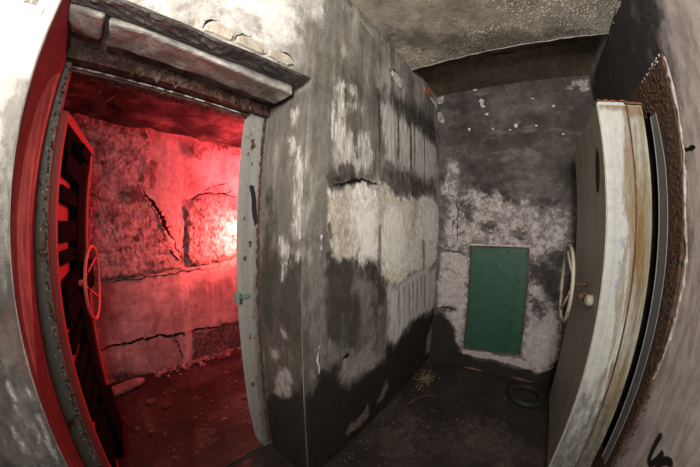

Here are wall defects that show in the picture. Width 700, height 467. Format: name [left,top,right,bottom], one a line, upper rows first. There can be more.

crack [104,183,235,285]
water stain [289,137,304,239]
crack [329,177,382,188]
water stain [327,82,436,201]
water stain [481,185,514,203]
corrosion [594,59,683,467]
crack [100,322,239,361]
water stain [262,188,564,467]